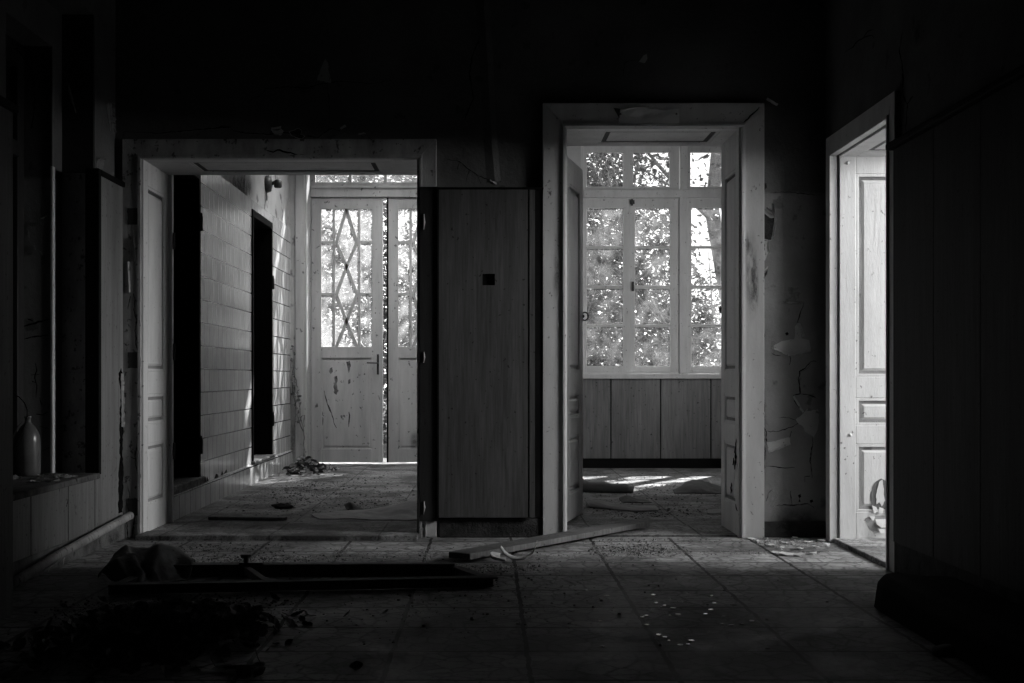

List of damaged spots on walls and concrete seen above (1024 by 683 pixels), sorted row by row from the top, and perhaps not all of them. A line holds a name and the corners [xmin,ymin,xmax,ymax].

peeling [764,323,812,356]
crack [764,331,817,508]